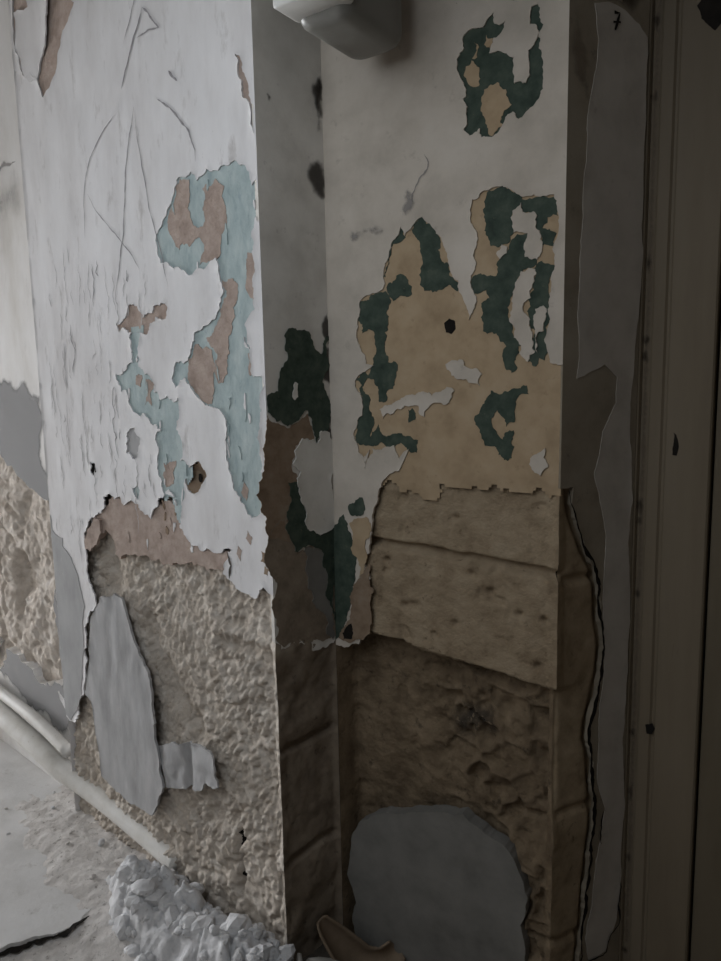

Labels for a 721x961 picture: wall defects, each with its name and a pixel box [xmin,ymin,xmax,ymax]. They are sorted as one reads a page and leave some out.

peeling [13,0,74,96]
spalling [237,55,252,108]
peeling [457,5,543,137]
spalling [0,455,63,681]
spalling [73,161,561,961]
peeling [577,2,648,960]
crack [569,491,622,961]